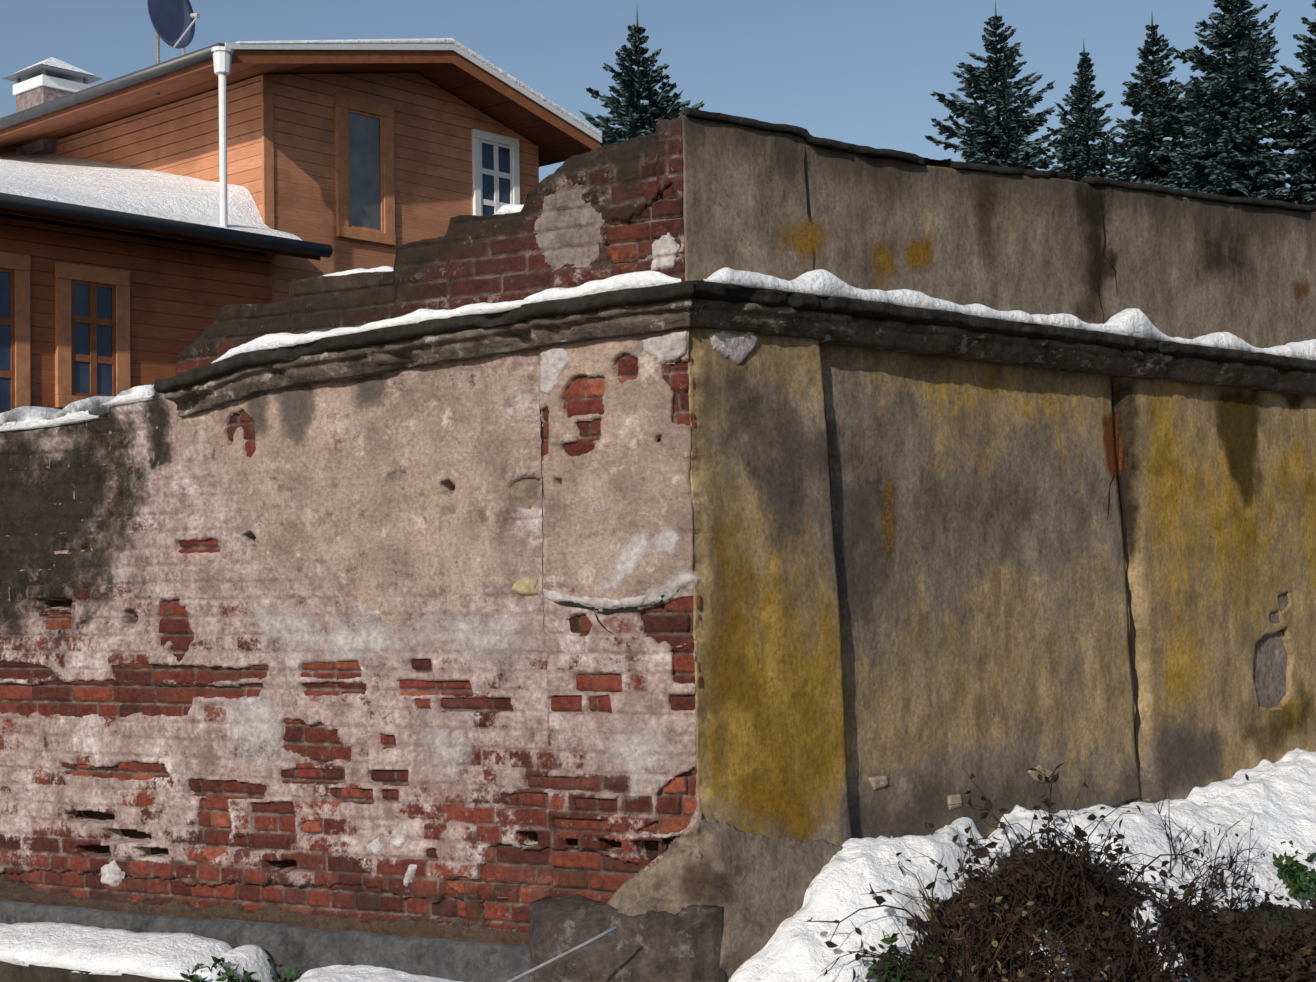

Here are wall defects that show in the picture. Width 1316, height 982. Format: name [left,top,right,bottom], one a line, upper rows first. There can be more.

peeling [533,183,683,272]
leakage [145,389,171,468]
spalling [539,330,695,456]
corrosion [1103,415,1127,479]
leakage [1111,383,1138,553]
leakage [1218,390,1260,504]
leakage [833,478,888,611]
spalling [0,600,269,718]
peeling [511,528,702,712]
crack [1107,475,1141,779]
spalling [188,718,409,861]
leakage [846,728,1222,841]